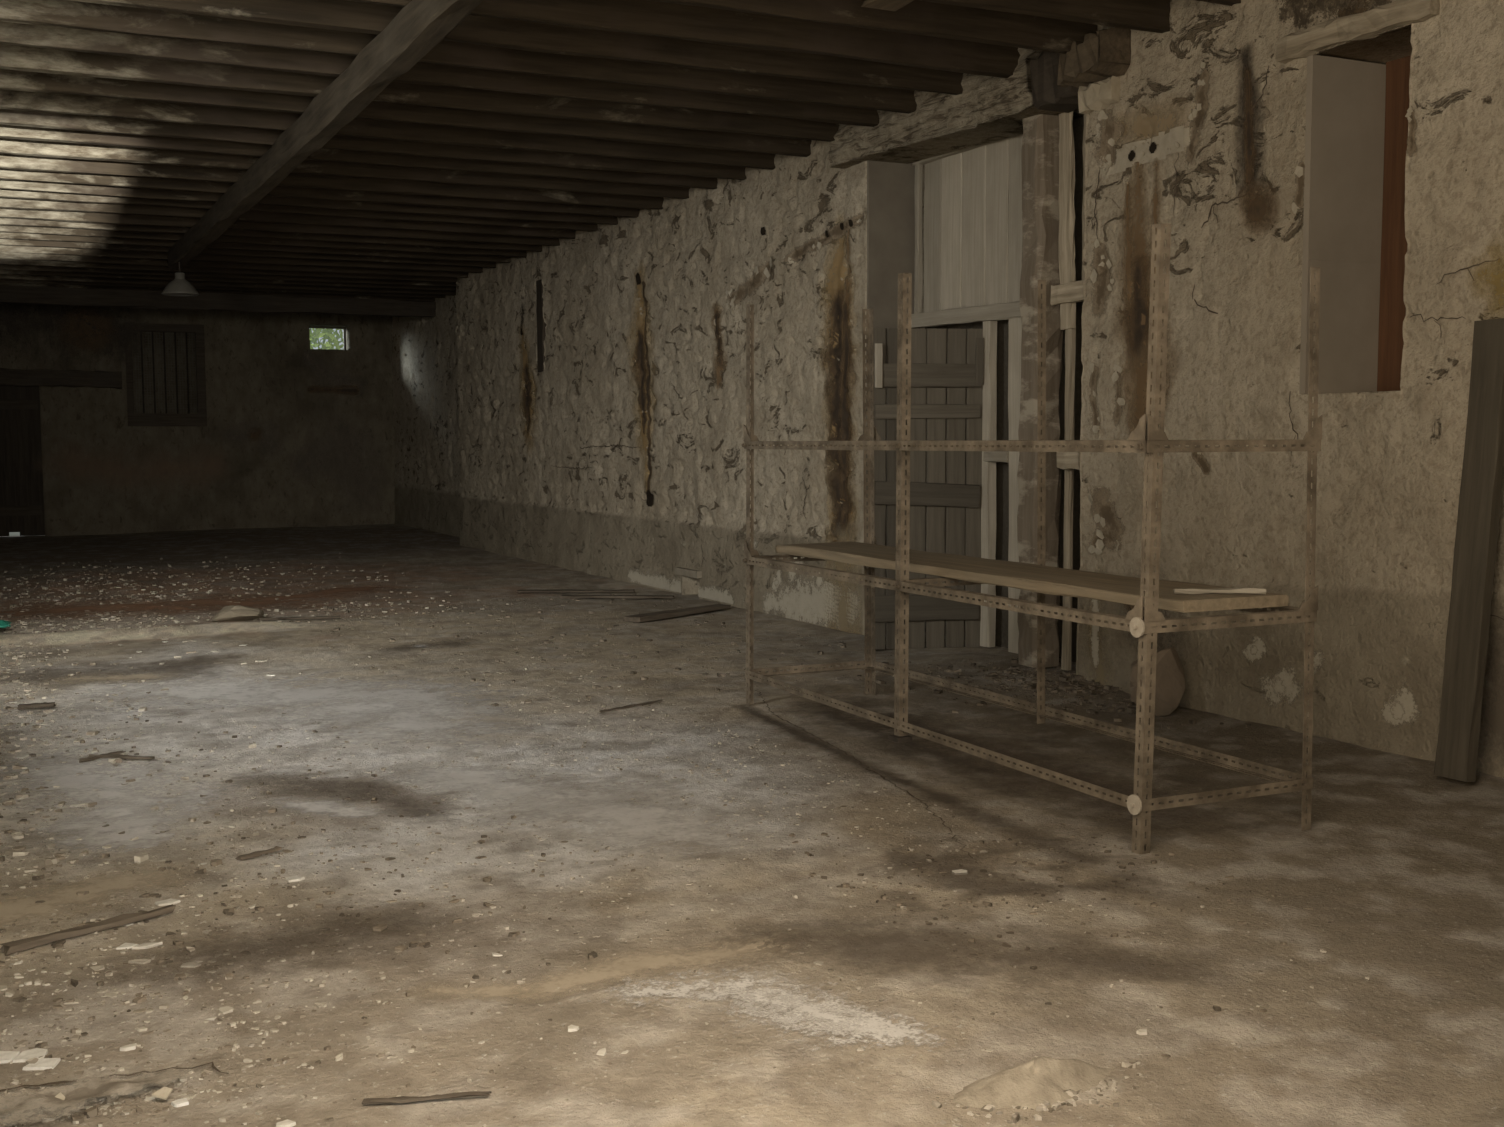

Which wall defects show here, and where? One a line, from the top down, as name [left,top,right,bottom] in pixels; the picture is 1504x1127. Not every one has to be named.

corrosion [632,270,651,490]
corrosion [823,229,854,542]
corrosion [1123,160,1169,430]
spalling [1092,61,1210,179]
spalling [1291,162,1305,214]
crack [0,1062,229,1092]